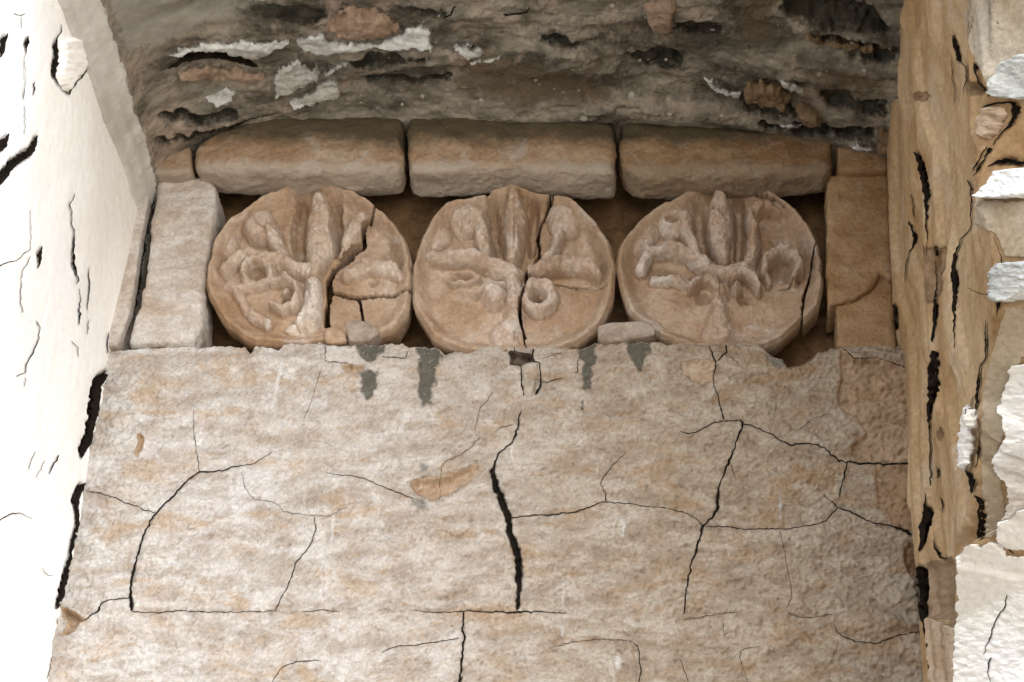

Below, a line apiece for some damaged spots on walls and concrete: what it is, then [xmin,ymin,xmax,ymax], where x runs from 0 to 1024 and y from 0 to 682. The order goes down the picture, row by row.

crack [0,13,87,185]
peeling [156,0,452,143]
peeling [626,0,722,68]
peeling [704,77,889,155]
spalling [779,0,898,63]
crack [28,194,109,476]
leakage [356,345,385,399]
leakage [416,348,443,405]
leakage [579,344,597,411]
leakage [627,343,651,371]
crack [439,35,1024,679]
crack [43,411,347,623]